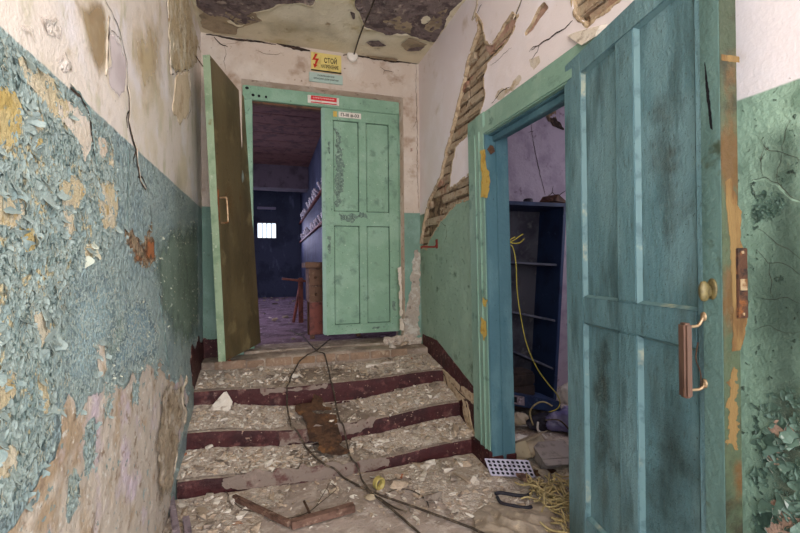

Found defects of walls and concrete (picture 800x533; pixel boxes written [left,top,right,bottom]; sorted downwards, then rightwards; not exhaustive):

flaking render [350,0,465,61]
spalling [528,4,548,33]
crack [529,20,573,60]
spalling [570,0,621,28]
crack [105,2,152,226]
spalling [383,12,521,345]
crack [752,123,800,202]
peeling [0,31,199,533]
peeling [749,386,800,533]